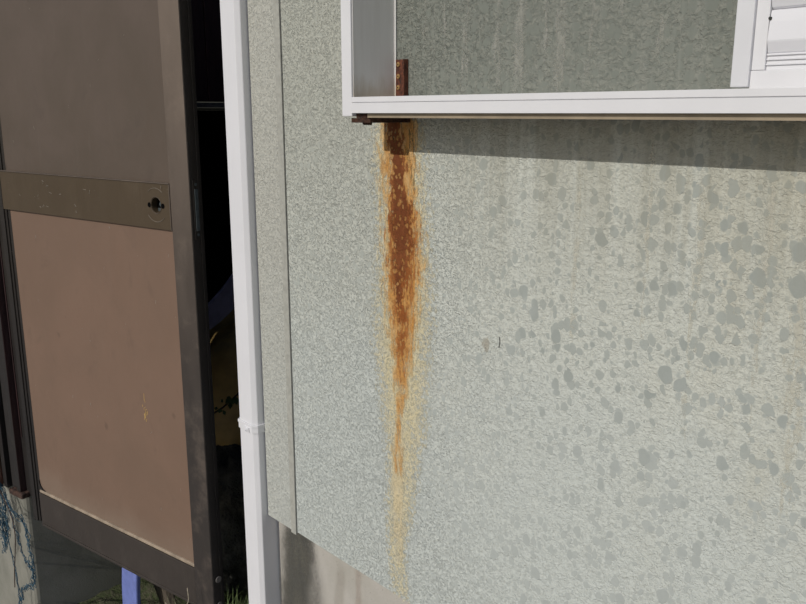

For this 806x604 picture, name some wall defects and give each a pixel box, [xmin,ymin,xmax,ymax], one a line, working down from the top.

rust [351,113,437,603]